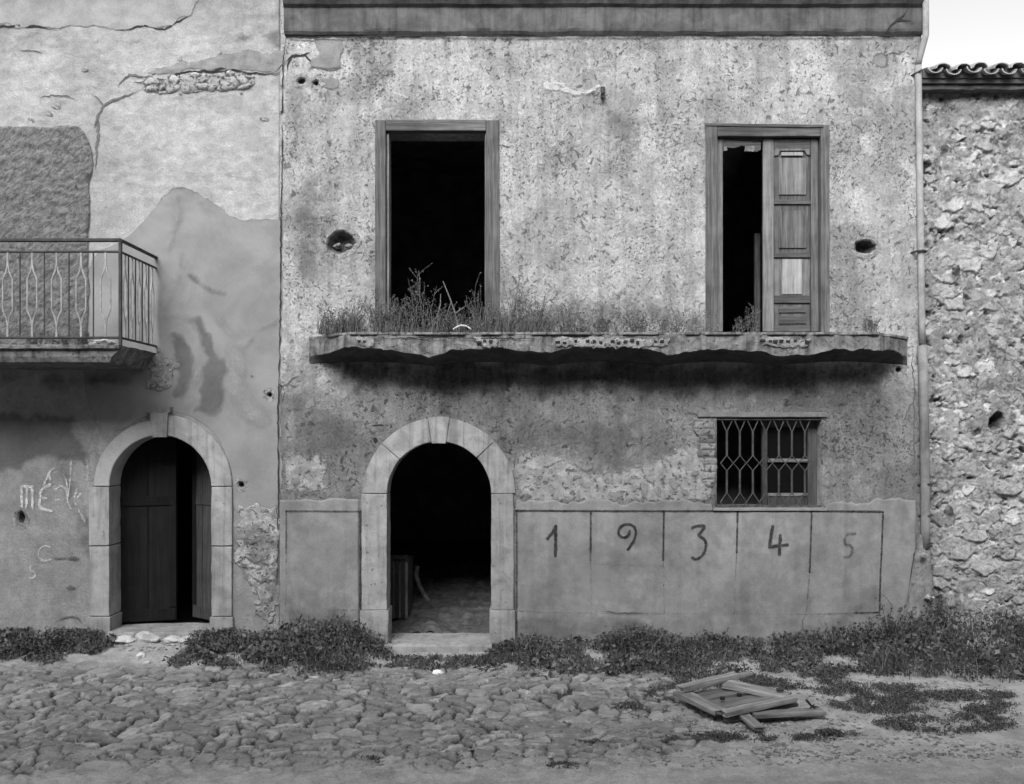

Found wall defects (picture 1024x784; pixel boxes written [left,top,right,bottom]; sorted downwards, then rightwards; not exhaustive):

spalling [142,48,284,94]
crack [40,10,919,582]
water stain [175,319,268,424]
peeling [515,418,717,503]
flaking render [234,503,280,623]